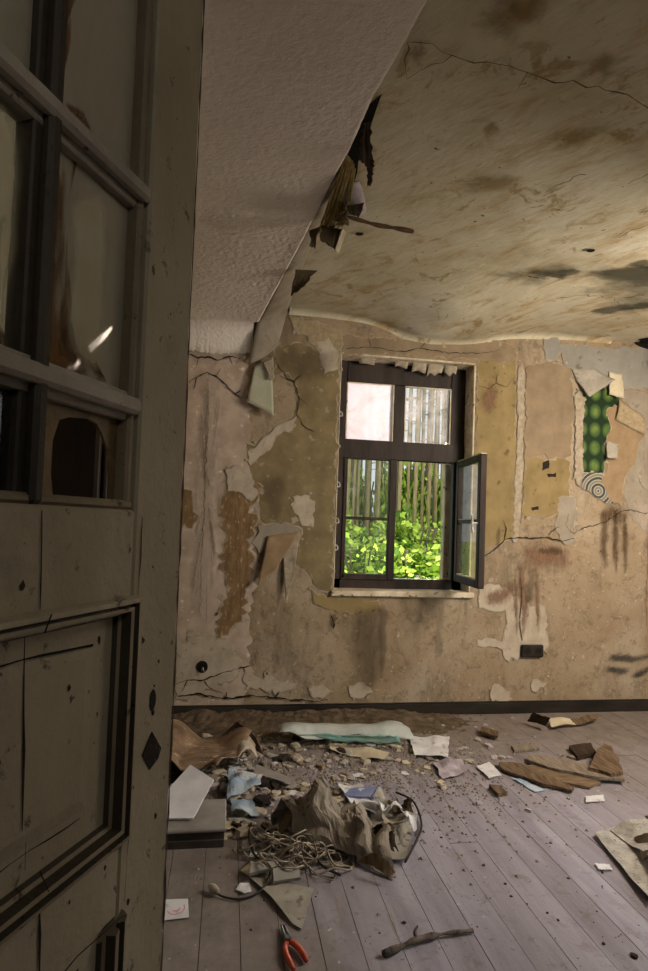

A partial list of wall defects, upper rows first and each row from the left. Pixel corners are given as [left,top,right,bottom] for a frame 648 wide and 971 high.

crack [404,42,648,108]
water stain [516,269,579,279]
water stain [592,261,648,314]
flaking render [542,337,648,532]
flaking render [172,320,382,706]
water stain [602,508,627,569]
flaking render [456,574,550,663]
crack [177,664,328,702]